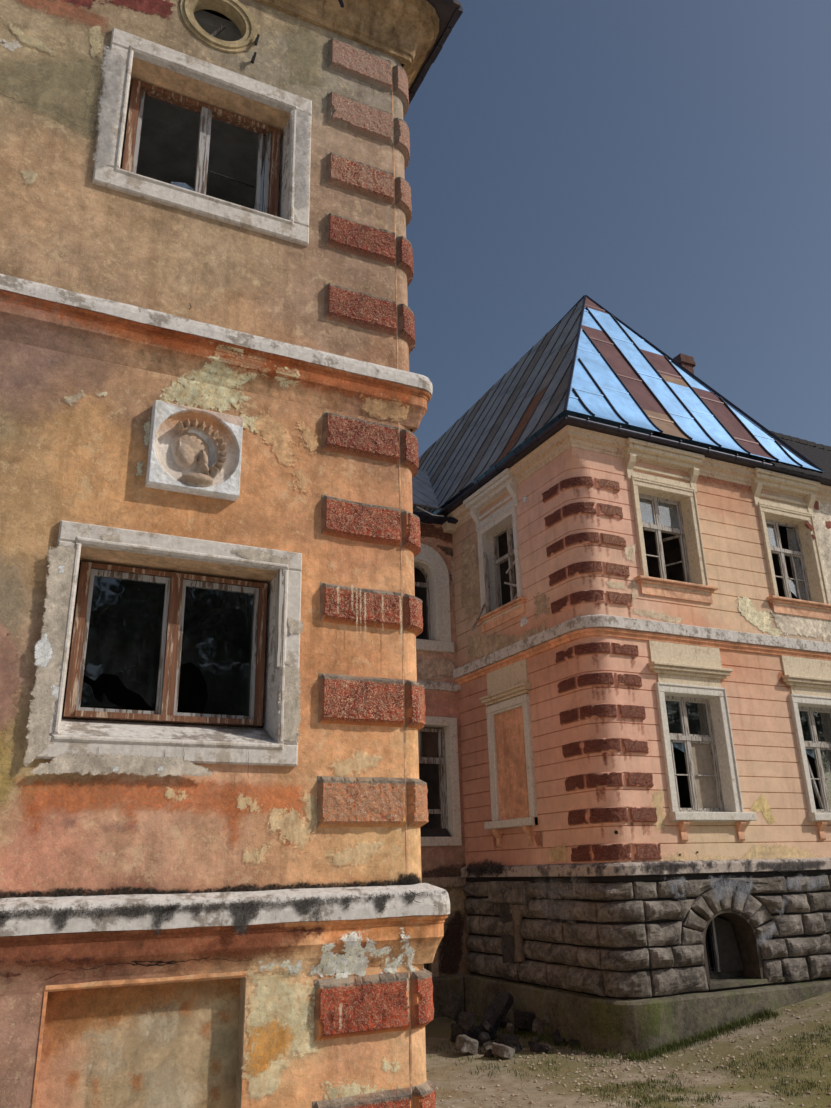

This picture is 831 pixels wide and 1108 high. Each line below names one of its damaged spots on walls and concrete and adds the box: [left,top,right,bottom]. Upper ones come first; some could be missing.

peeling [0,16,56,56]
peeling [61,0,176,18]
peeling [86,25,124,168]
peeling [291,109,310,208]
peeling [158,342,319,493]
peeling [360,392,410,425]
peeling [805,501,831,604]
peeling [736,596,831,643]
water stain [0,859,505,974]
peeling [242,927,417,1100]